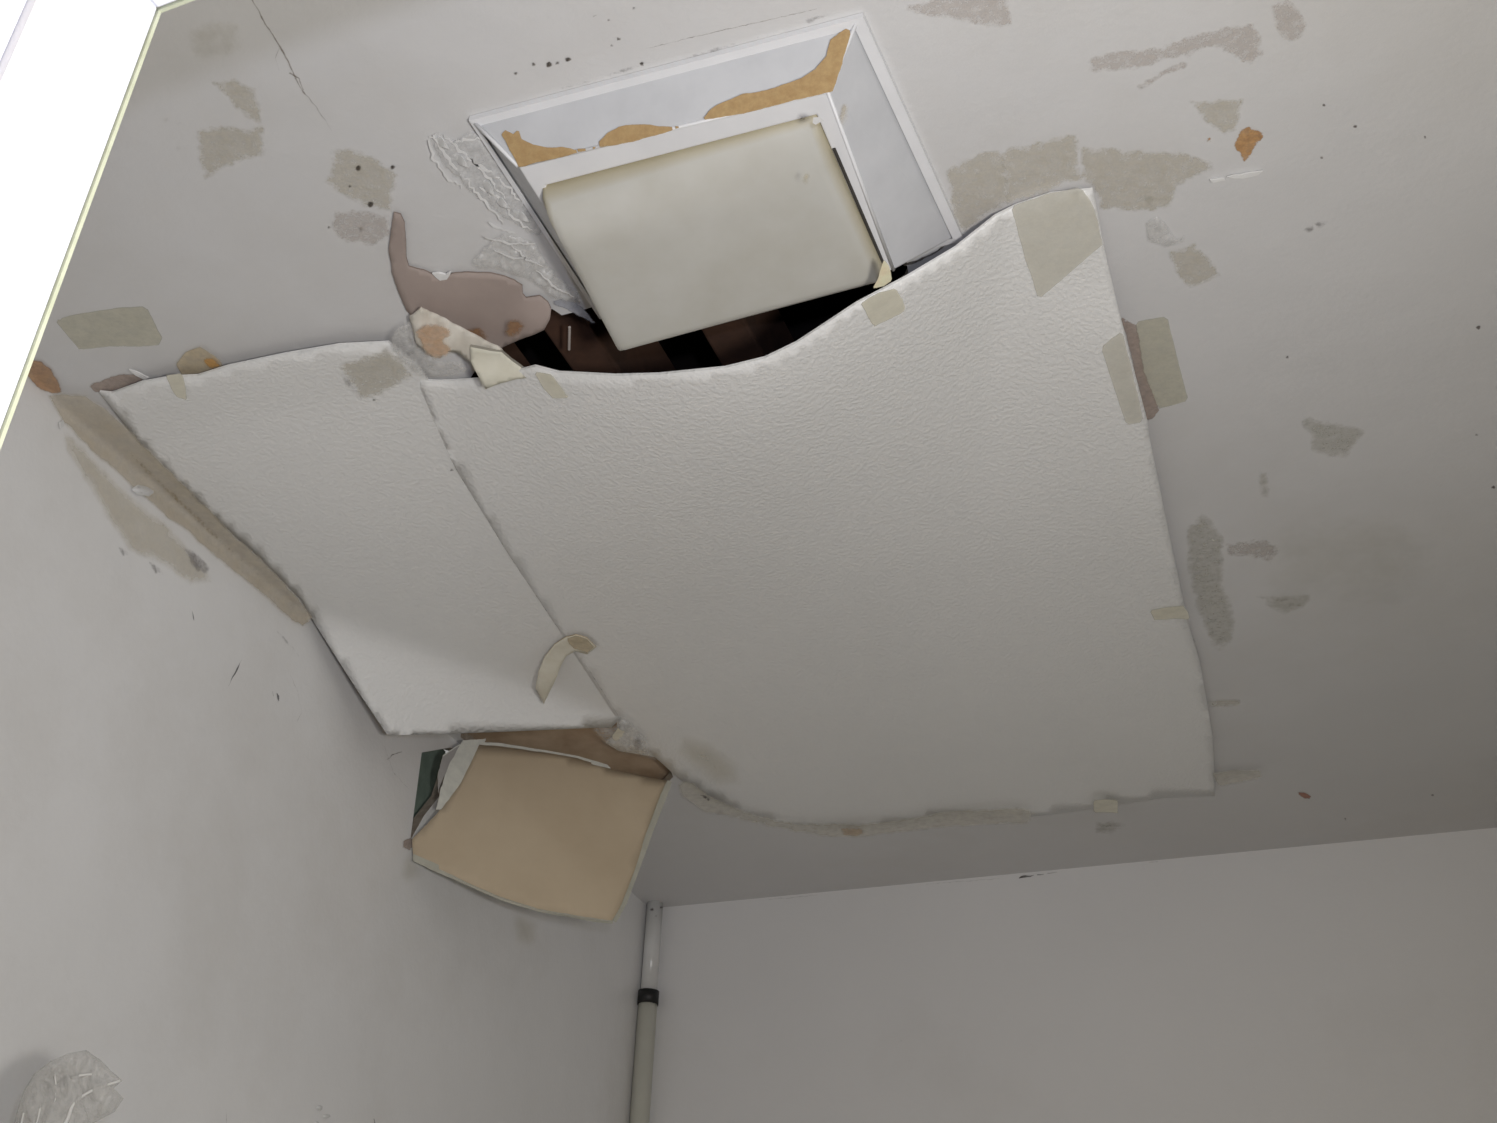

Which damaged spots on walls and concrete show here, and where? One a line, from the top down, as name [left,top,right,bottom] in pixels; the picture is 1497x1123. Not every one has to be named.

peeling [389,211,551,389]